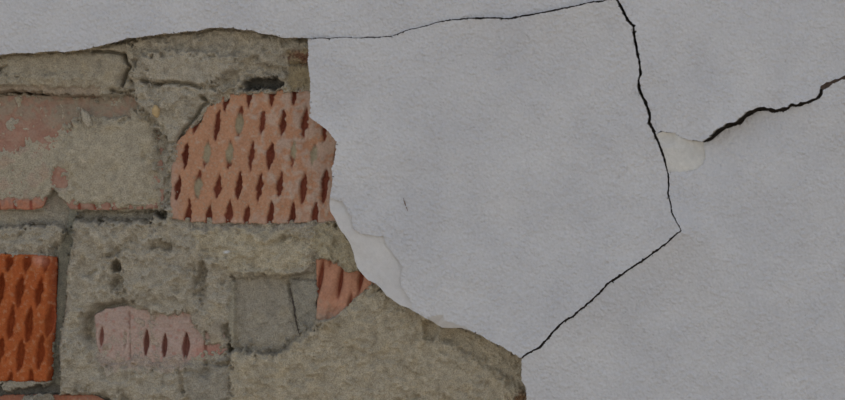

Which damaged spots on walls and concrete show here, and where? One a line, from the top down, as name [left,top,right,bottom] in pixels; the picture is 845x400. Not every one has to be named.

spalling [0,27,526,400]
crack [313,0,682,358]
crack [704,76,845,142]